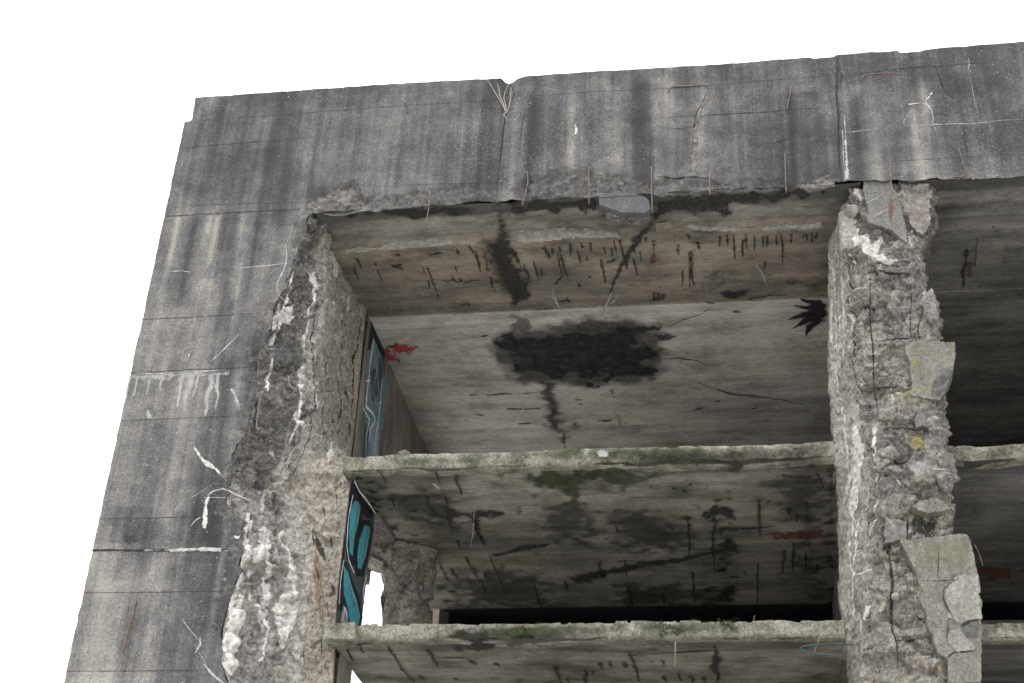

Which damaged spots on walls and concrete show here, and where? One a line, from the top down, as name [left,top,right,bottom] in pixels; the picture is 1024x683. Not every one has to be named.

spalling [289,184,493,270]
crack [601,55,1018,318]
spalling [862,161,933,244]
leakage [125,370,240,416]
spalling [269,335,305,375]
leakage [264,198,647,480]
leakage [355,209,898,644]
crack [843,253,927,466]
spalling [904,339,956,432]
leakage [909,462,951,476]
spalling [214,501,244,602]
spalling [883,498,983,683]